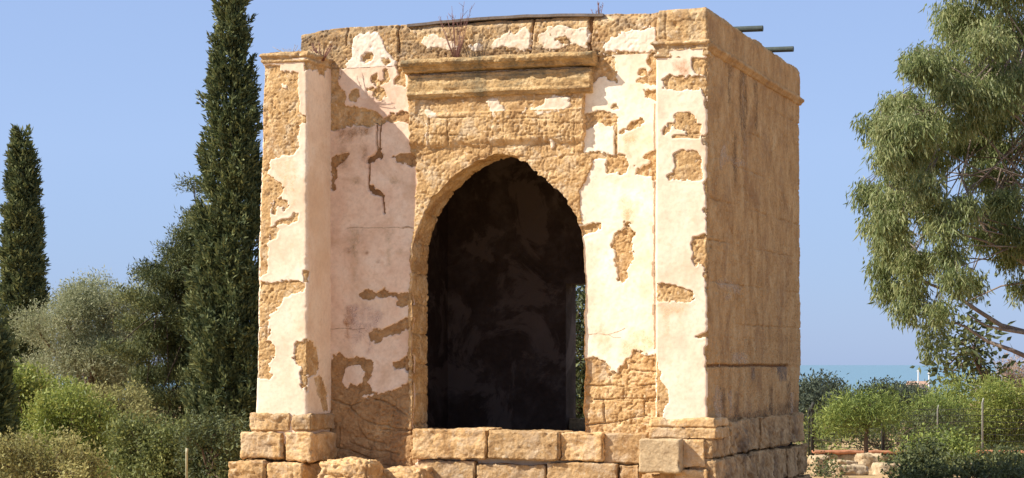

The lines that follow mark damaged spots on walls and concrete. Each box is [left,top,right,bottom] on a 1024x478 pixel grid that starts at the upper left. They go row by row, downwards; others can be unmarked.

peeling [593,56,618,83]
peeling [258,59,417,380]
crack [349,123,418,230]
spalling [610,222,636,283]
peeling [585,104,708,214]
peeling [657,234,739,303]
peeling [293,339,418,469]
peeling [584,350,669,433]